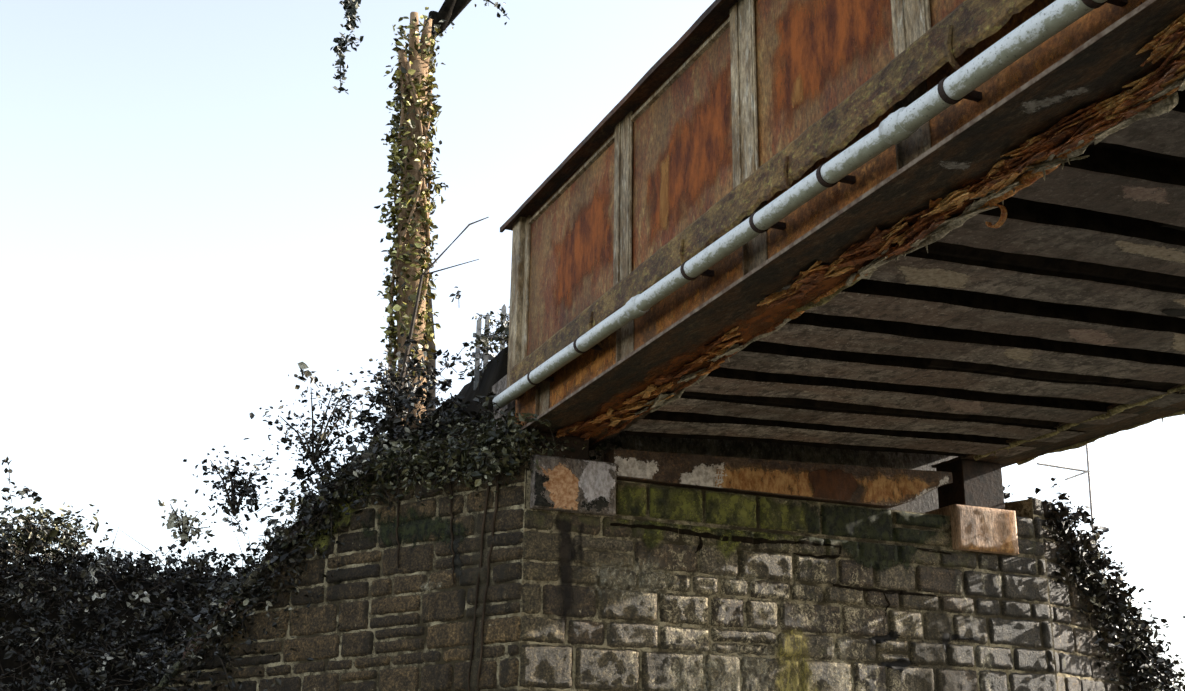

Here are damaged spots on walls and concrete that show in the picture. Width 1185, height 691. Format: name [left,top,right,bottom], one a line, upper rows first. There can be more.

spalling [757,13,1185,309]
peeling [1171,333,1185,352]
peeling [539,456,659,510]
peeling [680,462,727,488]
leakage [556,519,665,632]
leakage [661,629,817,691]